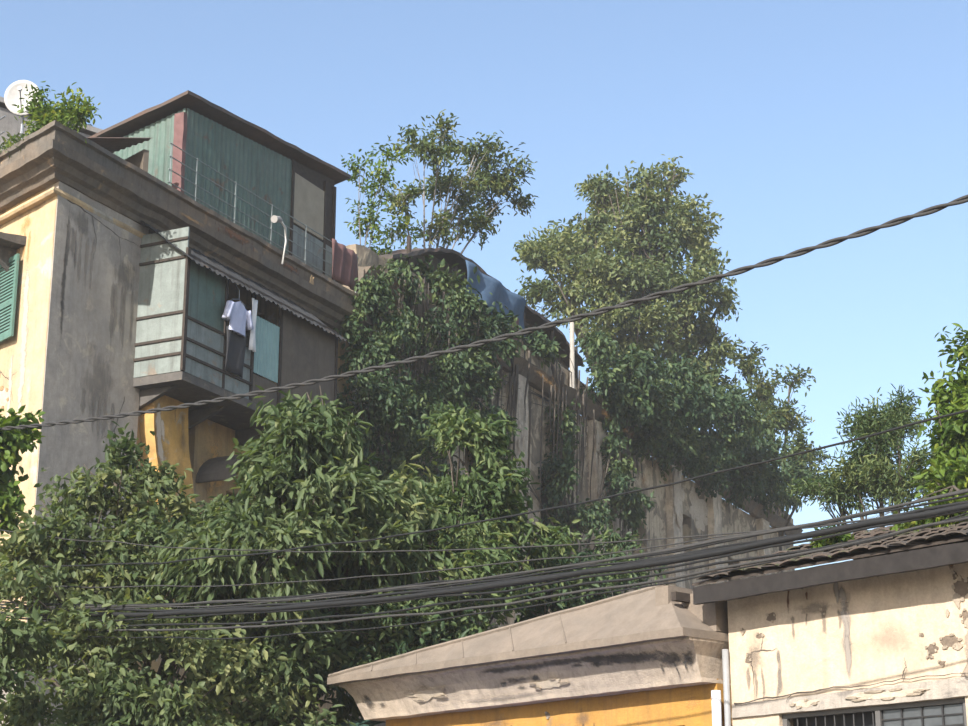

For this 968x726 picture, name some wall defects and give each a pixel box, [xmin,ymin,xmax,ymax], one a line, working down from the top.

water stain [60,215,95,334]
water stain [110,264,134,347]
water stain [484,652,693,689]
water stain [806,582,851,674]
spalling [918,571,968,677]